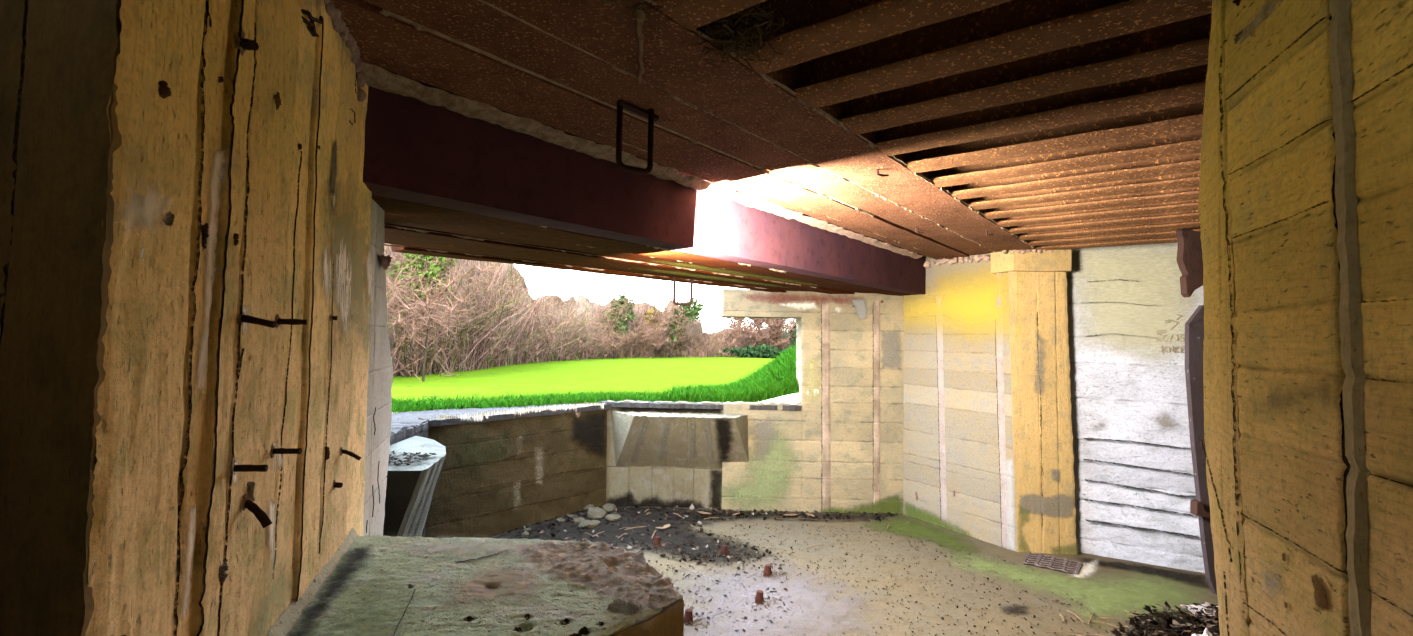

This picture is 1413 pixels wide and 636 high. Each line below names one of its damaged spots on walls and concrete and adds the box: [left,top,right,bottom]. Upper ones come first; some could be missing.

rust [1312,574,1328,610]